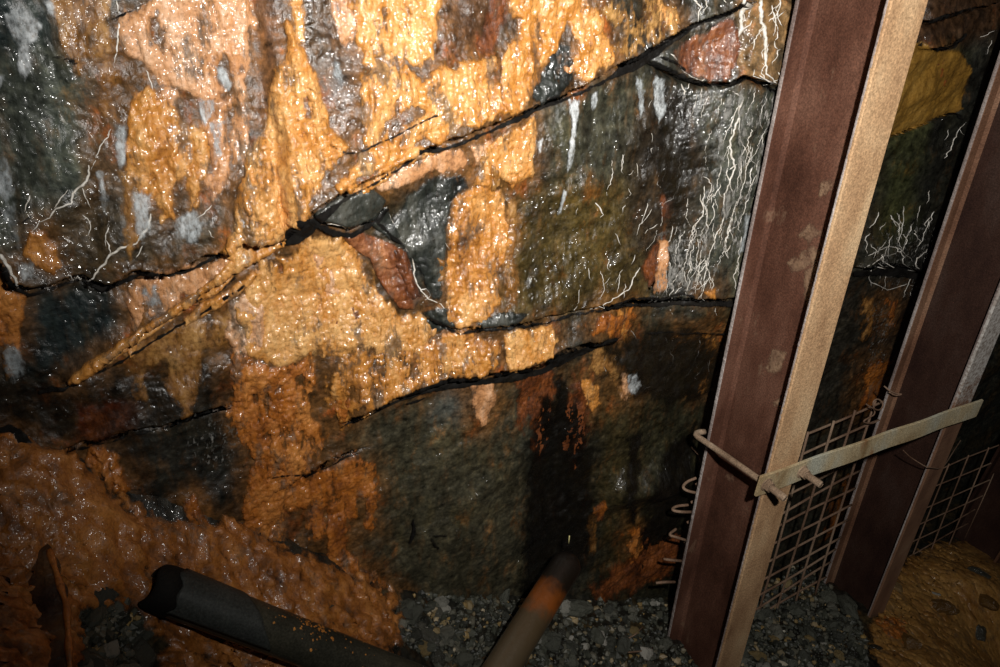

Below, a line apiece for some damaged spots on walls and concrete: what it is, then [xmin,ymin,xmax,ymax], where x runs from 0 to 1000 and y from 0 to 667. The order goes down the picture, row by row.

crack [280,0,778,246]
water stain [569,99,579,164]
water stain [636,77,699,210]
crack [0,251,223,297]
crack [429,292,735,335]
crack [0,424,32,443]
crack [66,408,222,453]
crack [341,338,618,428]
corrosion [515,370,557,456]
corrosion [562,381,590,454]
corrosion [305,450,379,556]
water stain [520,373,607,597]